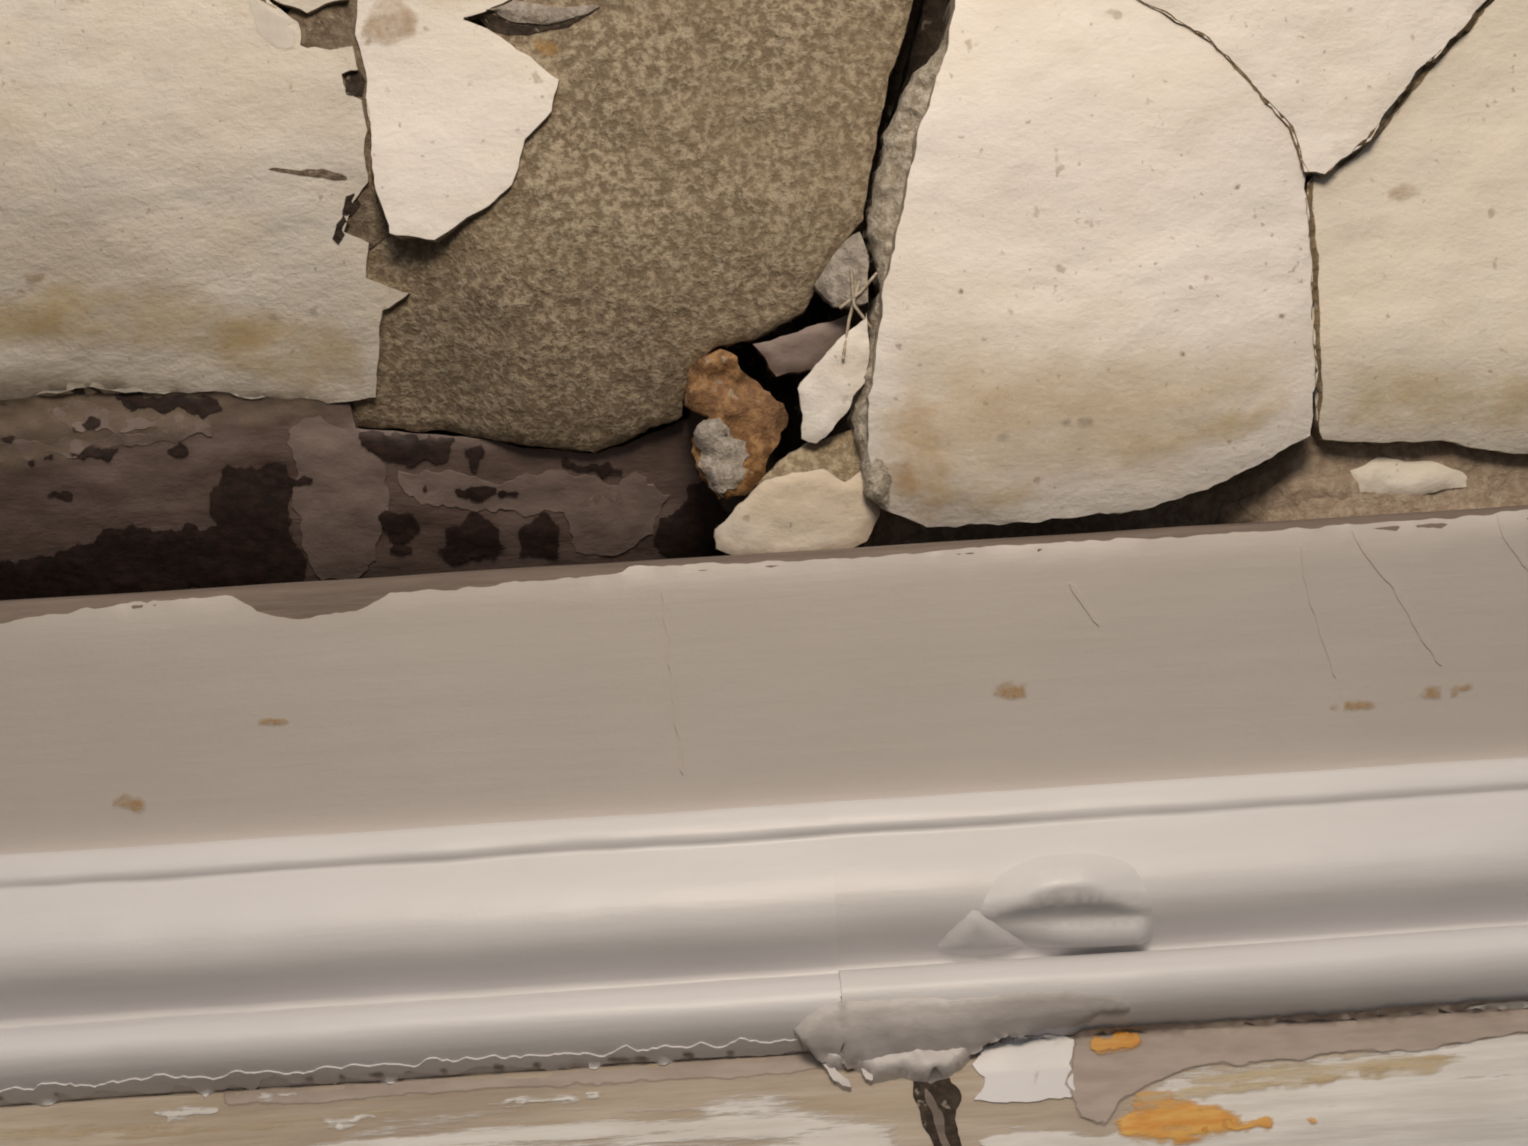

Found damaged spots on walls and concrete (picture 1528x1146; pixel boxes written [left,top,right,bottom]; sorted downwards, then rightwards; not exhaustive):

spalling [0,0,913,601]
spalling [864,432,1528,547]
peeling [0,1037,897,1146]
corrosion [1117,1074,1338,1145]
peeling [972,1000,1528,1146]